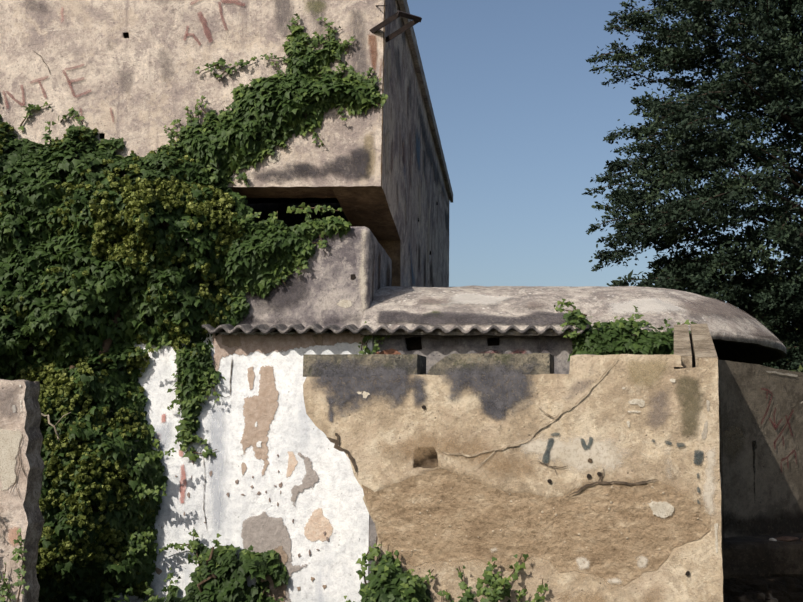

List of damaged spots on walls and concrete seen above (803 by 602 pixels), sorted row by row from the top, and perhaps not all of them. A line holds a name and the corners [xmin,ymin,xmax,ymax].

damp [257,148,369,180]
peeling [212,331,367,371]
damp [312,360,426,422]
damp [446,364,532,420]
peeling [235,366,319,506]
crack [327,433,356,472]
crack [570,469,657,495]
spalling [362,468,718,585]
peeling [241,508,333,602]